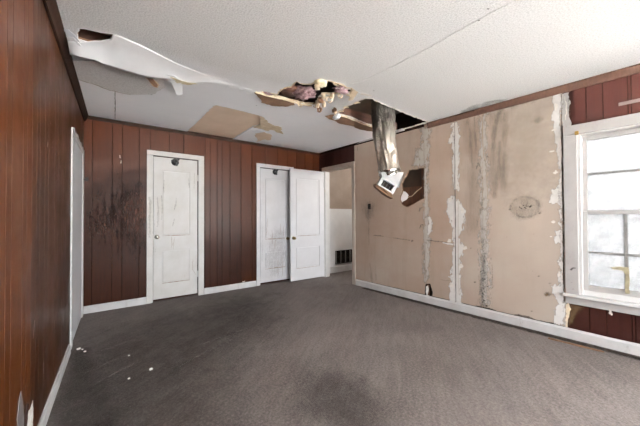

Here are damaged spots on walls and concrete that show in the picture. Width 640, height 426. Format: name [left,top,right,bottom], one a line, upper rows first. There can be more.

peeling [64,29,251,95]
peeling [254,118,283,142]
peeling [554,92,572,127]
spalling [400,168,425,211]